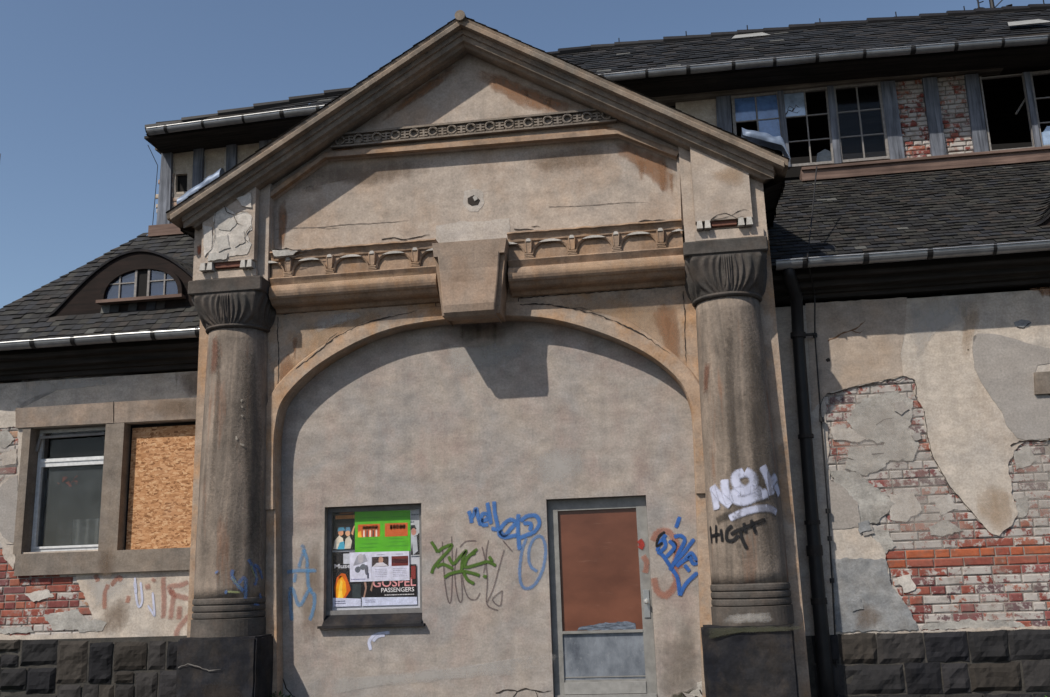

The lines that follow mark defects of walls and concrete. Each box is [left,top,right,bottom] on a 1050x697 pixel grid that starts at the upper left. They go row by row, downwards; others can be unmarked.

peeling [203,193,252,262]
crack [518,286,686,357]
flaking render [0,427,18,483]
flaking render [824,376,1050,631]
flaking render [0,538,107,636]
crack [496,688,548,697]